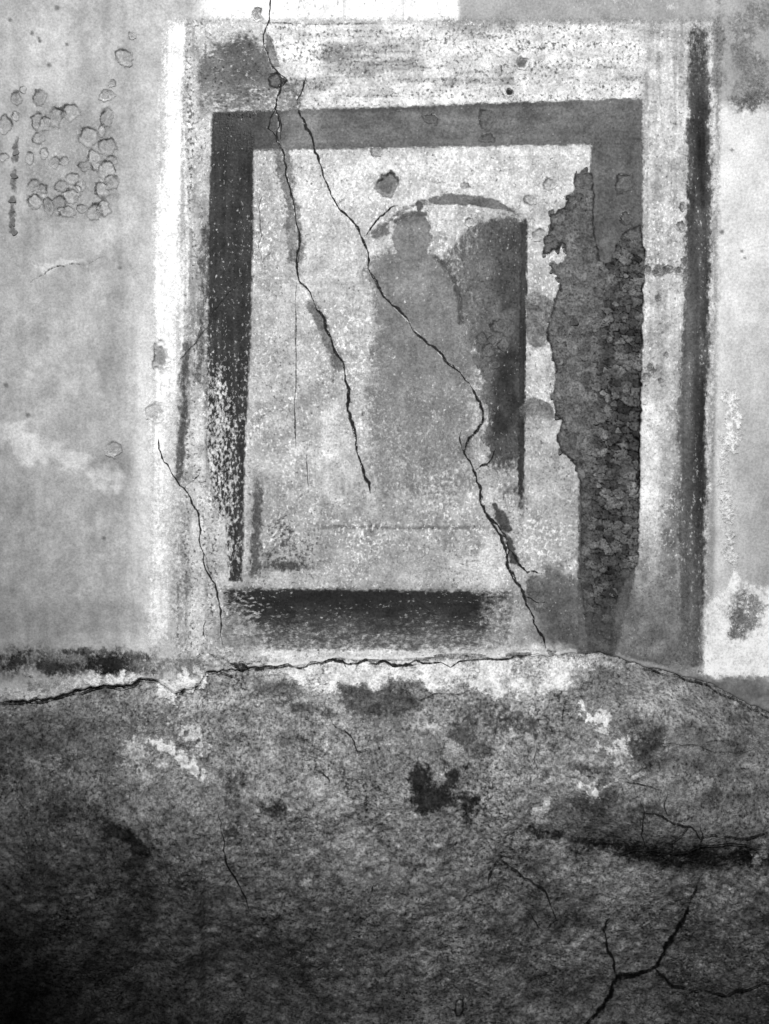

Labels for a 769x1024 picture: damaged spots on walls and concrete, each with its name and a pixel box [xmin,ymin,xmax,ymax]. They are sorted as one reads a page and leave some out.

spalling [0,79,119,236]
crack [158,0,546,694]
peeling [519,167,687,638]
water stain [703,388,769,679]
crack [2,678,154,704]
water stain [0,644,769,870]
crack [644,669,769,718]
water stain [333,821,407,895]
crack [584,885,769,1024]